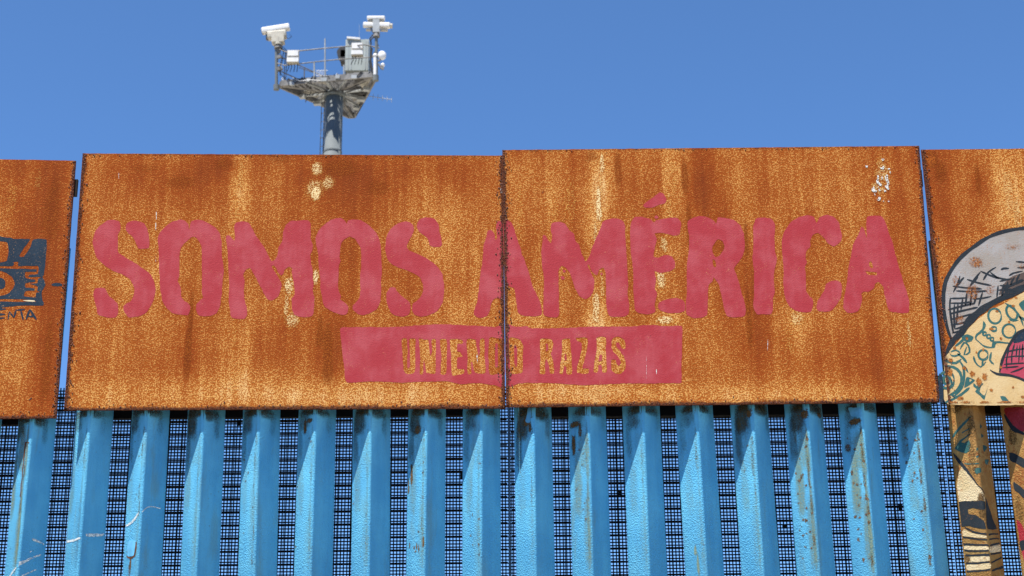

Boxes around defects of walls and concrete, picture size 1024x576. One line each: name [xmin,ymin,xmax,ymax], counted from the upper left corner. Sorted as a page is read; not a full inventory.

rust [0,146,1024,559]